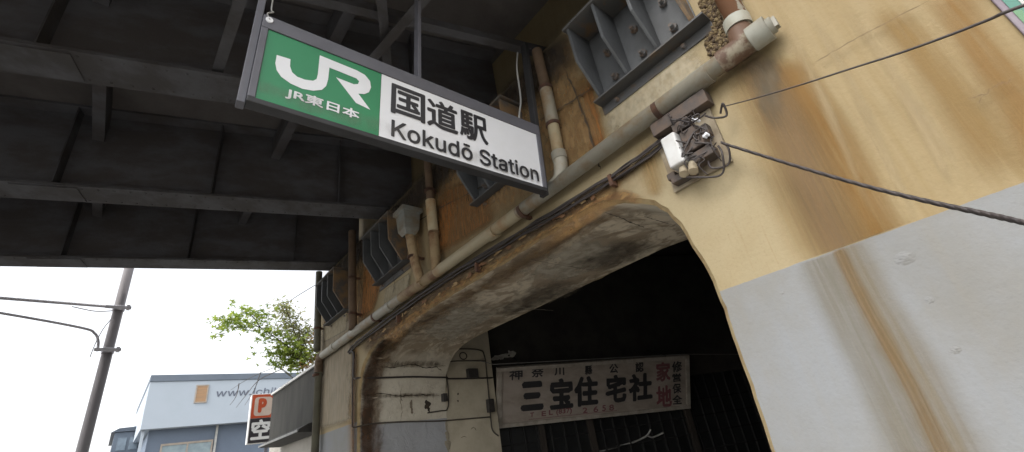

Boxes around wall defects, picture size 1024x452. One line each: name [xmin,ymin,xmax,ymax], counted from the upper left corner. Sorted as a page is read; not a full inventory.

water stain [501,39,568,105]
water stain [318,158,643,452]
rust [839,249,965,452]